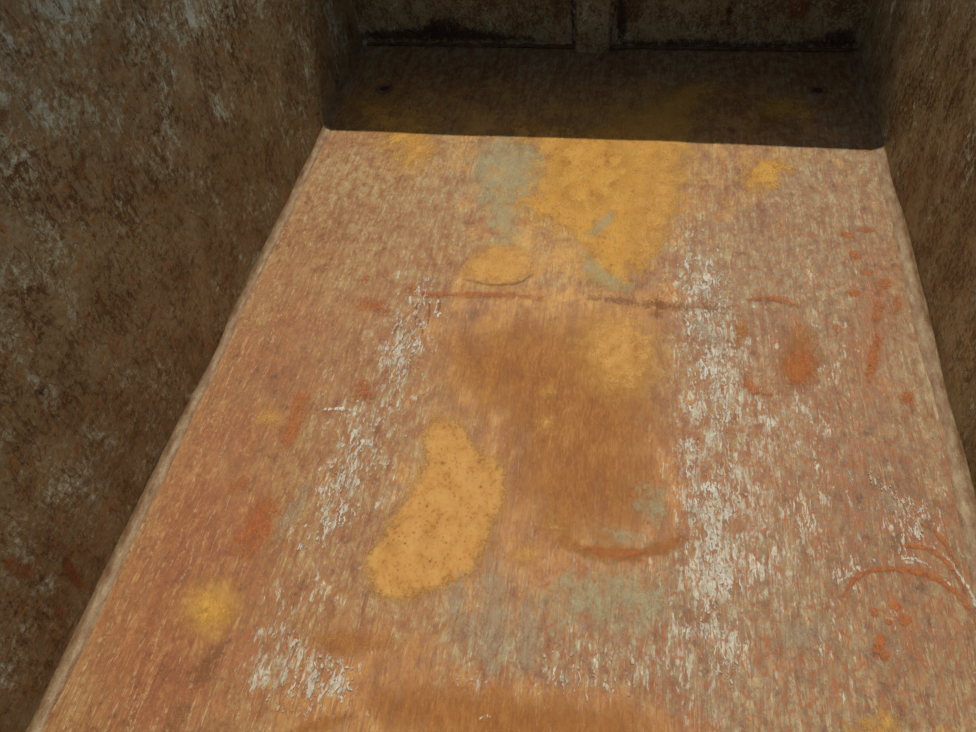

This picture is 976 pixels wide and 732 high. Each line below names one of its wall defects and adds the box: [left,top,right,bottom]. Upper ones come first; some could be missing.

rust [348,97,434,165]
rust [410,245,539,298]
rust [500,81,713,303]
peeling [297,277,448,552]
rust [365,418,506,601]
peeling [664,228,758,685]